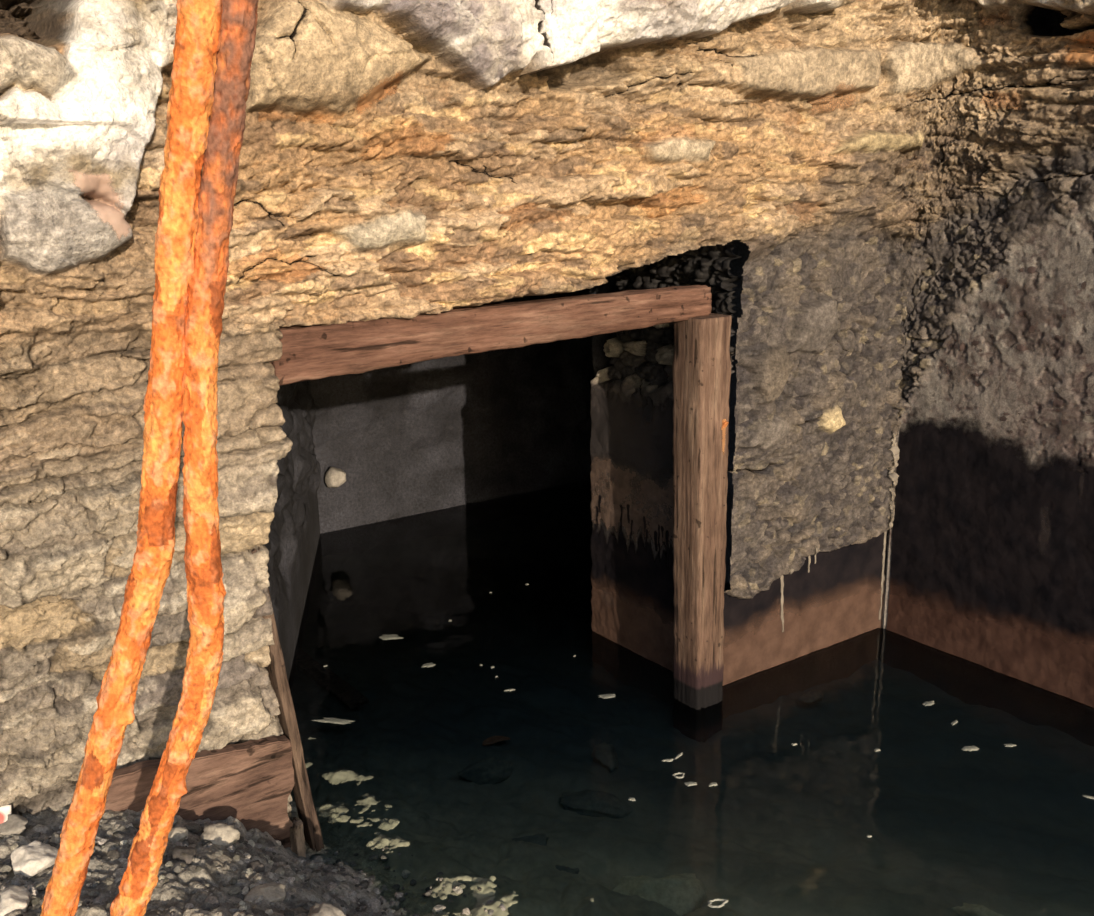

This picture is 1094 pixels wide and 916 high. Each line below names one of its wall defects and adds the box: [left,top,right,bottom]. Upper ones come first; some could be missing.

crack [276,1,308,56]
crack [519,0,554,77]
corrosion [70,170,131,239]
crack [234,199,289,226]
damp [723,412,1094,640]
damp [590,526,675,618]